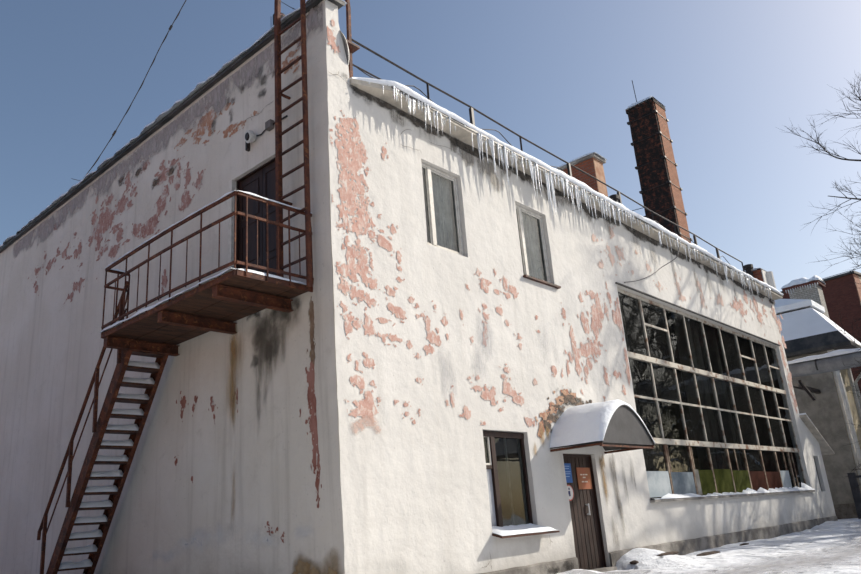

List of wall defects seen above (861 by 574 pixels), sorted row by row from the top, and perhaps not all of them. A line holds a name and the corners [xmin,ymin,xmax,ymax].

peeling [28,102,258,296]
peeling [330,110,450,359]
peeling [592,226,634,276]
peeling [176,391,198,422]
peeling [299,296,322,508]
peeling [345,352,381,433]
peeling [446,385,471,420]
peeling [467,364,524,412]
peeling [470,268,523,350]
peeling [524,282,631,439]
peeling [646,261,797,412]
water stain [292,558,338,574]